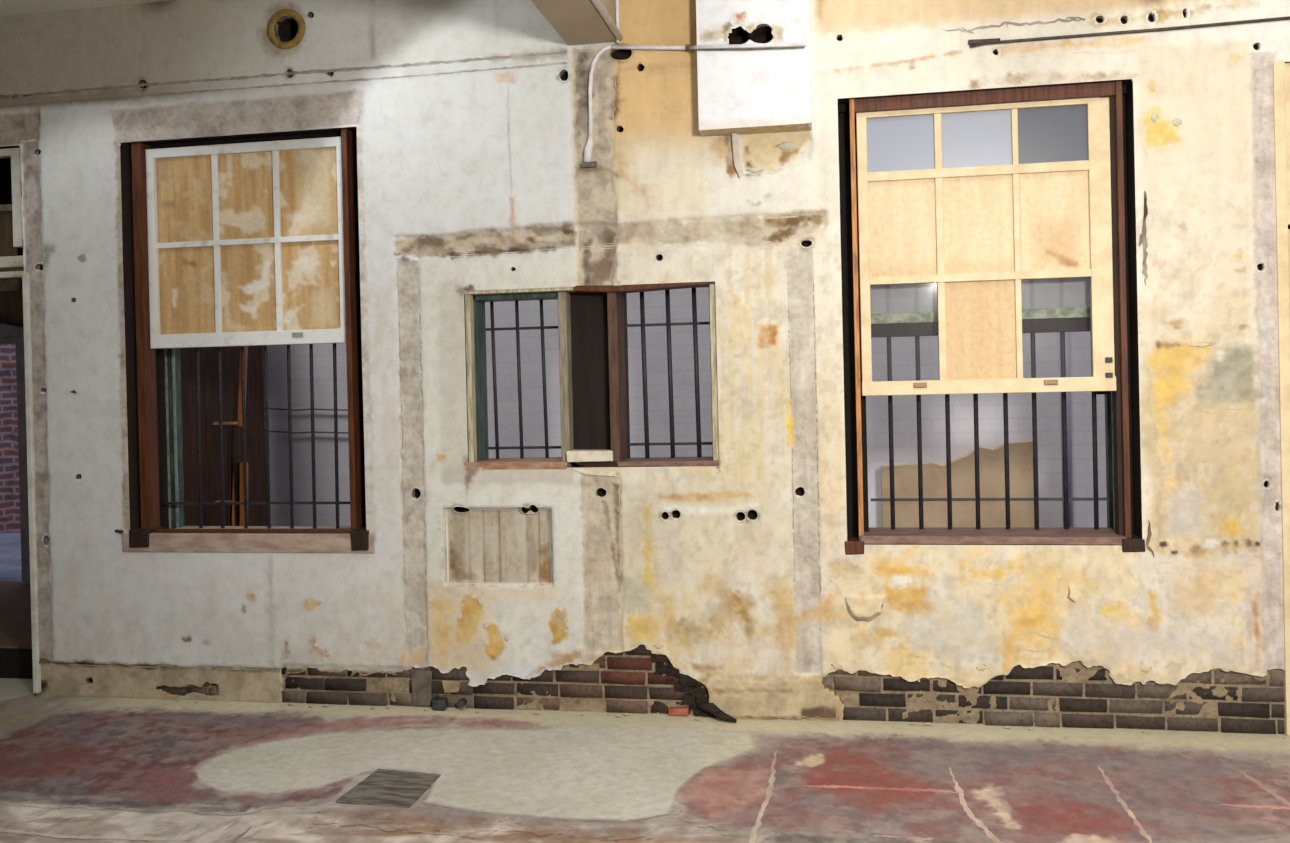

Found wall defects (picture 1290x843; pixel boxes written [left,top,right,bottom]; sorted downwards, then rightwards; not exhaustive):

leakage [1136,0,1167,11]
flaking render [1086,0,1265,33]
flaking render [554,41,638,166]
crack [1139,191,1148,285]
flaking render [0,64,1285,734]
peeling [0,703,546,814]
peeling [672,727,1290,843]